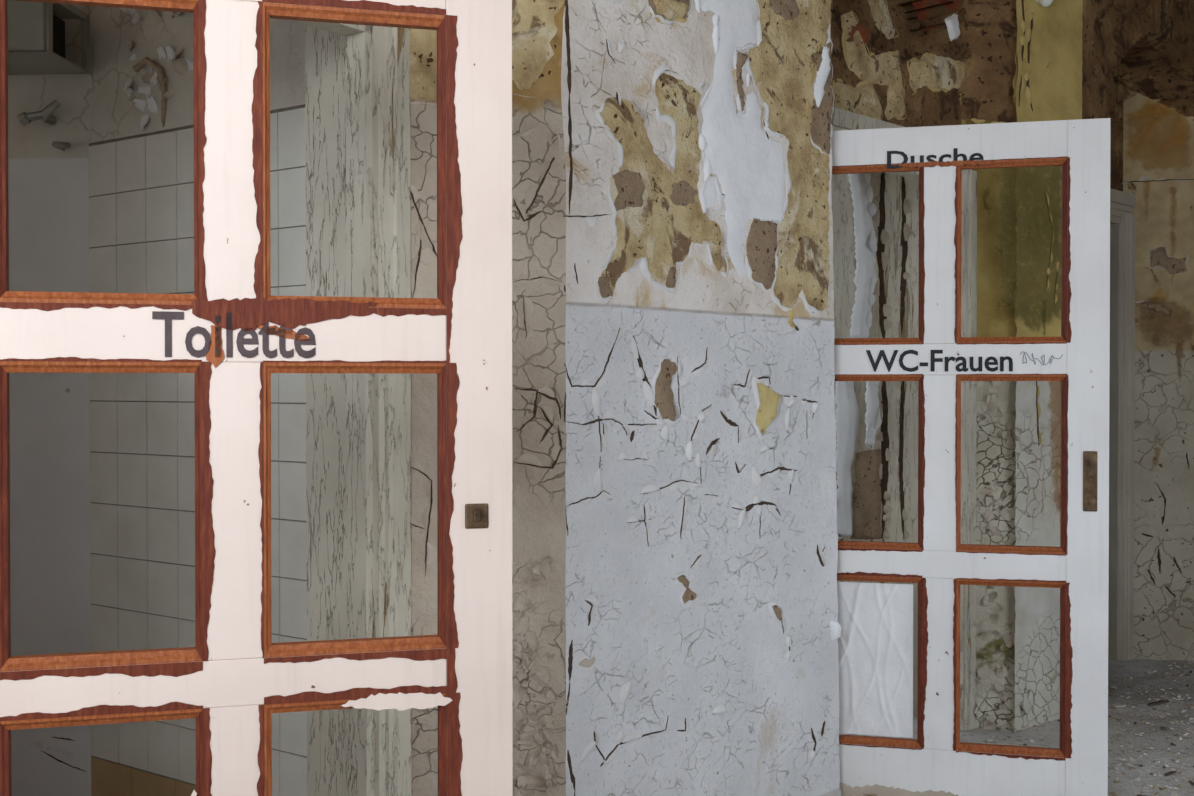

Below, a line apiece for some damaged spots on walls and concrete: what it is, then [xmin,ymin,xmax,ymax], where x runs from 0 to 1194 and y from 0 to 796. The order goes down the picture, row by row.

flaking render [409,28,437,105]
flaking render [512,0,565,98]
peeling [595,0,1017,338]
crack [788,308,799,331]
flaking render [651,356,680,426]
crack [515,328,820,570]
flaking render [752,376,784,441]
crack [816,545,827,567]
crack [1141,482,1182,599]
crack [566,595,599,715]
crack [567,681,727,796]
crack [809,721,829,762]